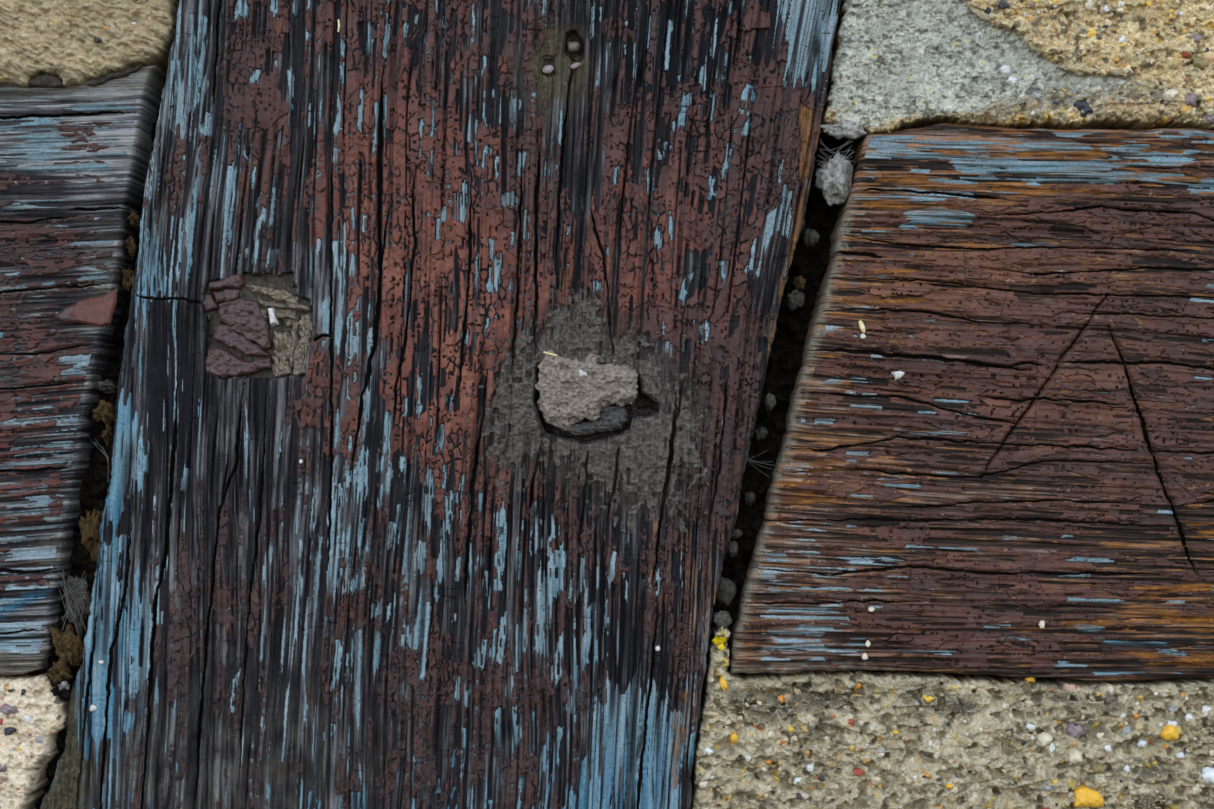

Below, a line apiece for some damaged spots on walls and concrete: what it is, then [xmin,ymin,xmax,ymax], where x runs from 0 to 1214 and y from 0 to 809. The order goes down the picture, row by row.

peeling [0,122,117,591]
spalling [28,65,144,88]
peeling [143,121,211,231]
peeling [202,274,279,379]
spalling [214,0,1134,809]
peeling [741,159,1214,678]
crack [763,348,1214,527]
peeling [114,476,313,809]